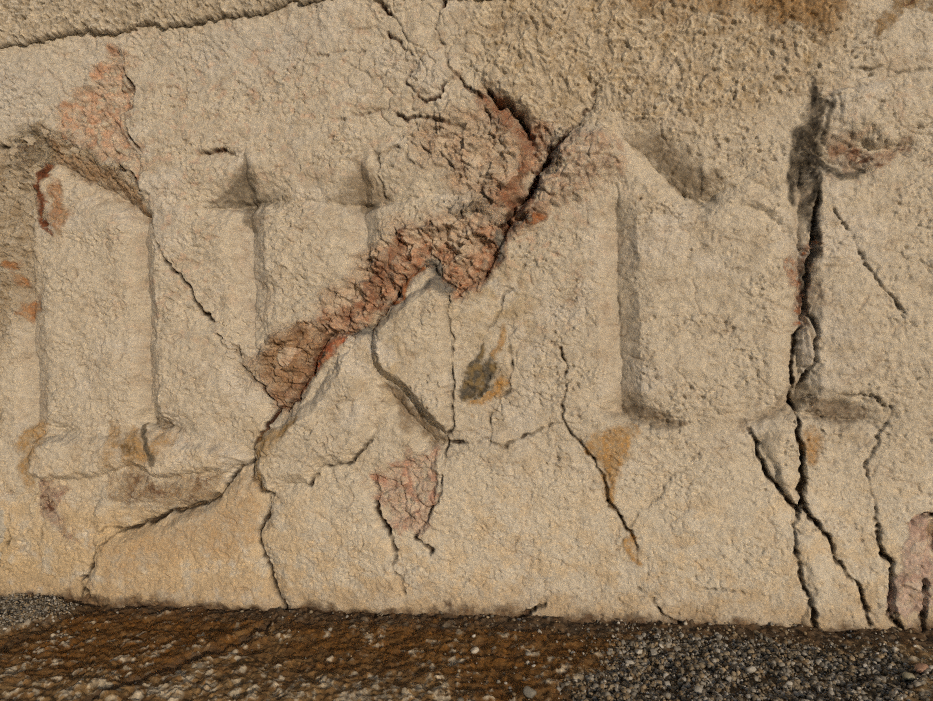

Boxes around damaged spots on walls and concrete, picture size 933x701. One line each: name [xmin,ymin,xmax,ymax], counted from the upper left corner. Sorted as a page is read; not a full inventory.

flaking render [9,44,146,213]
crack [165,260,215,322]
flaking render [251,97,626,409]
crack [398,78,585,278]
water stain [787,79,866,313]
crack [81,280,405,701]
flaking render [371,446,440,536]
crack [376,480,440,557]
crack [570,431,633,536]
crack [747,196,927,628]
flaking render [887,513,933,626]